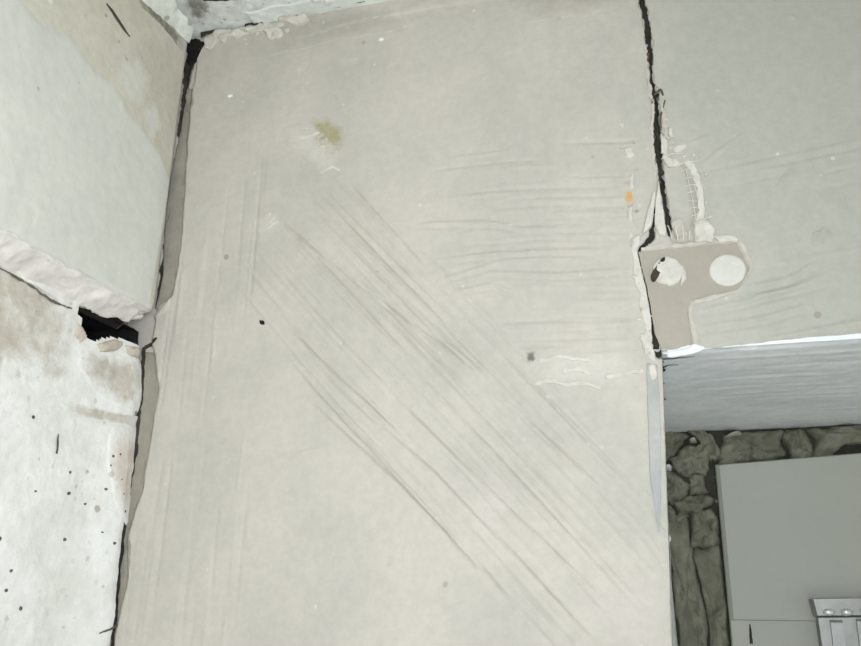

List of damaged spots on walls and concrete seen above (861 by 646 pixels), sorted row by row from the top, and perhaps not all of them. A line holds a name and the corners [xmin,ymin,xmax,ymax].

flaking render [0,0,194,320]
crack [155,214,171,309]
crack [173,38,204,164]
leakage [309,115,348,164]
crack [638,0,695,400]
leakage [0,266,142,525]
spalling [75,323,86,343]
crack [130,337,157,495]
crack [99,522,127,646]